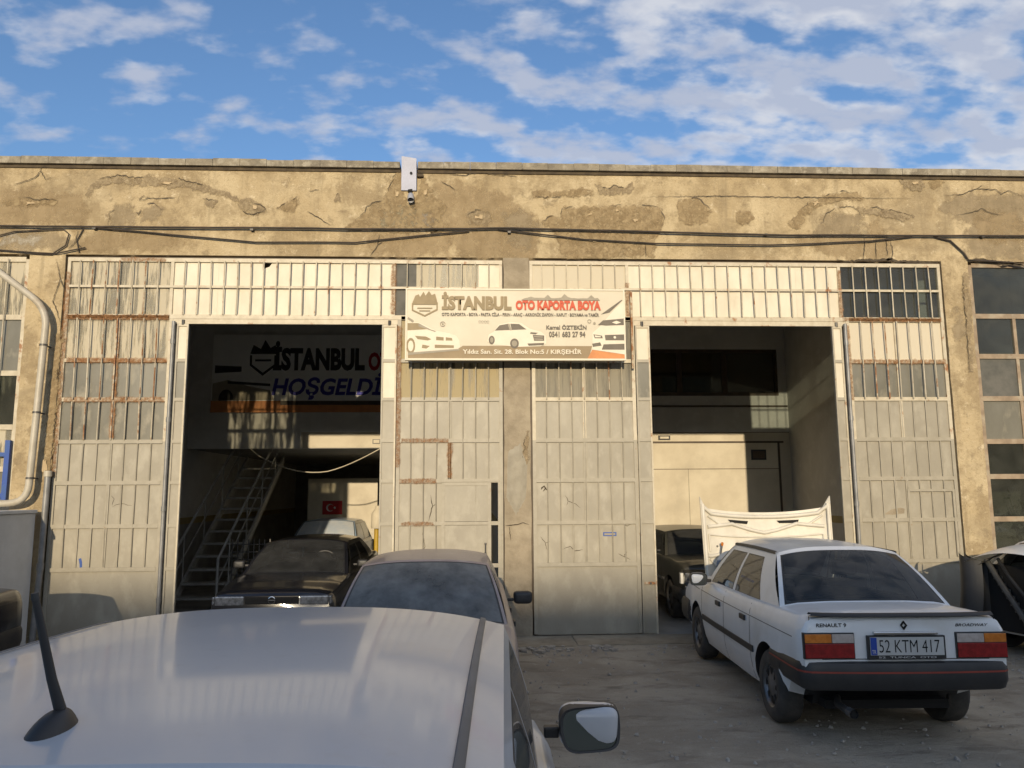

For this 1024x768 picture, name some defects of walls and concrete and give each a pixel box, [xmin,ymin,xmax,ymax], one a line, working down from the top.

flaking render [85,174,297,215]
spalling [532,182,665,259]
spalling [677,197,712,226]
spalling [736,211,755,225]
flaking render [788,190,915,229]
crack [953,186,1018,215]
rust [52,272,168,477]
crack [505,522,580,551]